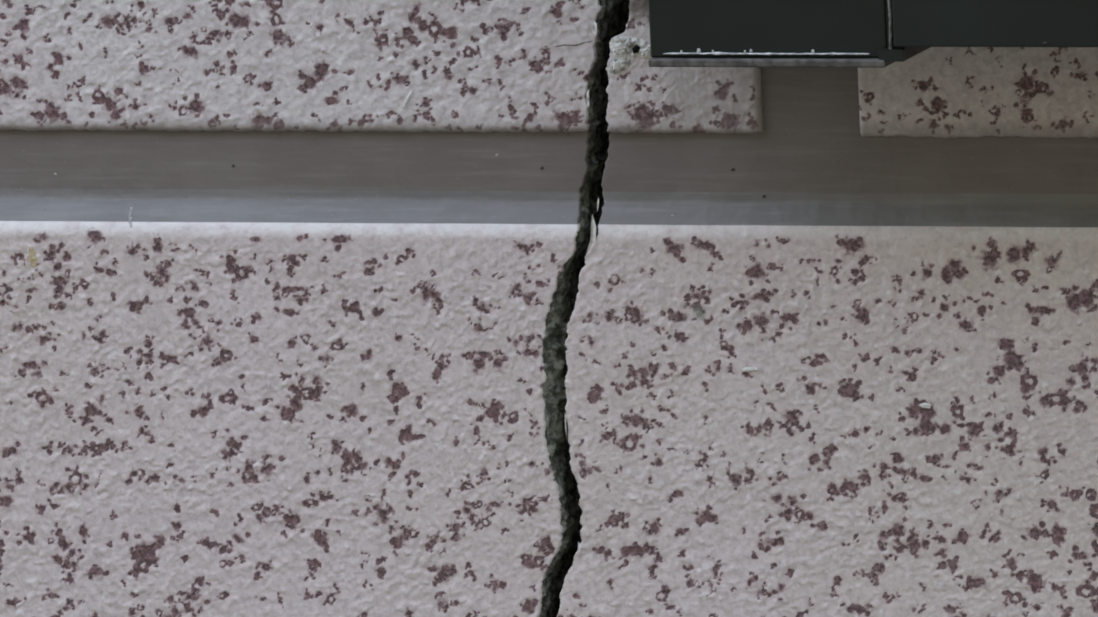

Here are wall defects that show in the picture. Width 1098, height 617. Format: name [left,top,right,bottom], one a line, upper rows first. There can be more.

crack [539,0,630,617]